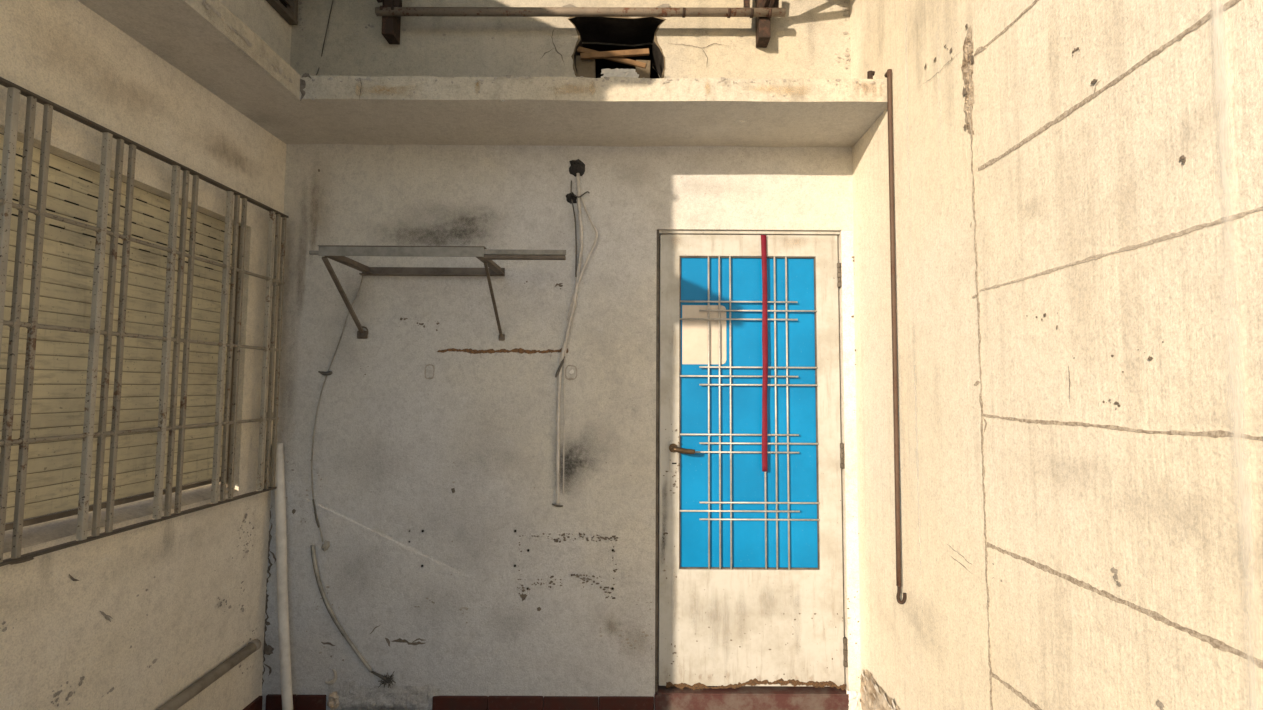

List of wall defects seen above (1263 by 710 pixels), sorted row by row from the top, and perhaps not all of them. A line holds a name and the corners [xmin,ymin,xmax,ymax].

spalling [553,4,701,97]
peeling [827,1,884,99]
spalling [924,24,974,135]
peeling [517,533,618,601]
spalling [51,676,85,707]
rust [666,678,846,691]
spalling [858,670,900,710]